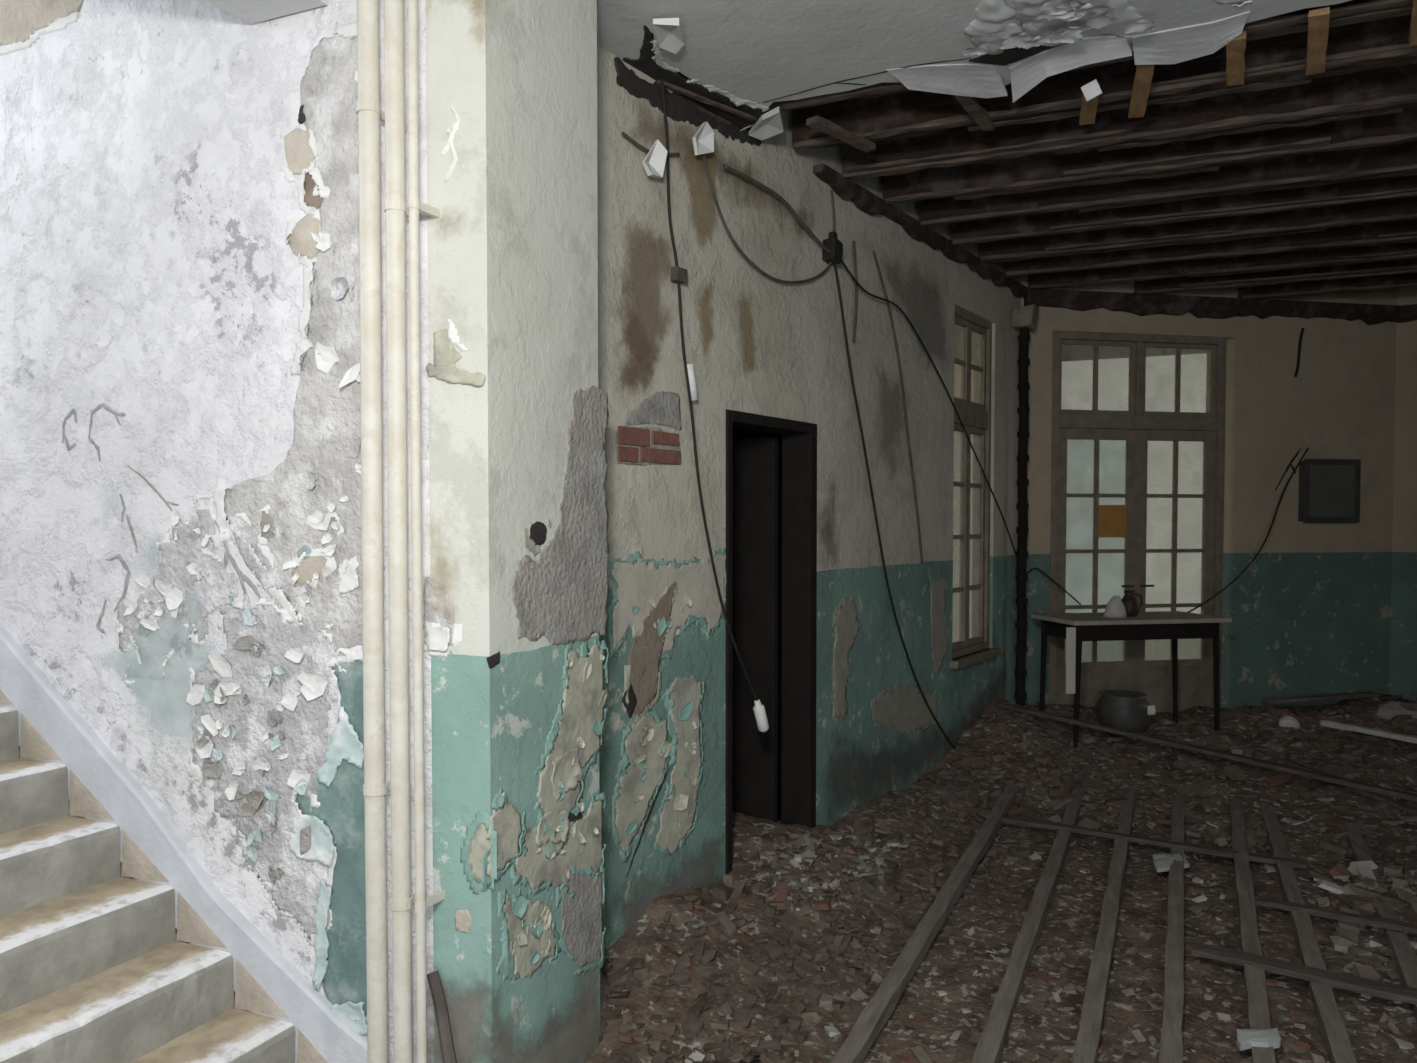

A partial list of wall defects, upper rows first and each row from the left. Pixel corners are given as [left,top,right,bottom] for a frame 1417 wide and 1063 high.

spalling [614,18,784,155]
peeling [886,0,1253,103]
peeling [642,139,668,178]
leakage [649,125,763,195]
leakage [627,234,664,382]
peeling [115,21,367,1035]
spalling [460,385,727,982]
peeling [831,596,861,721]
peeling [455,909,472,933]